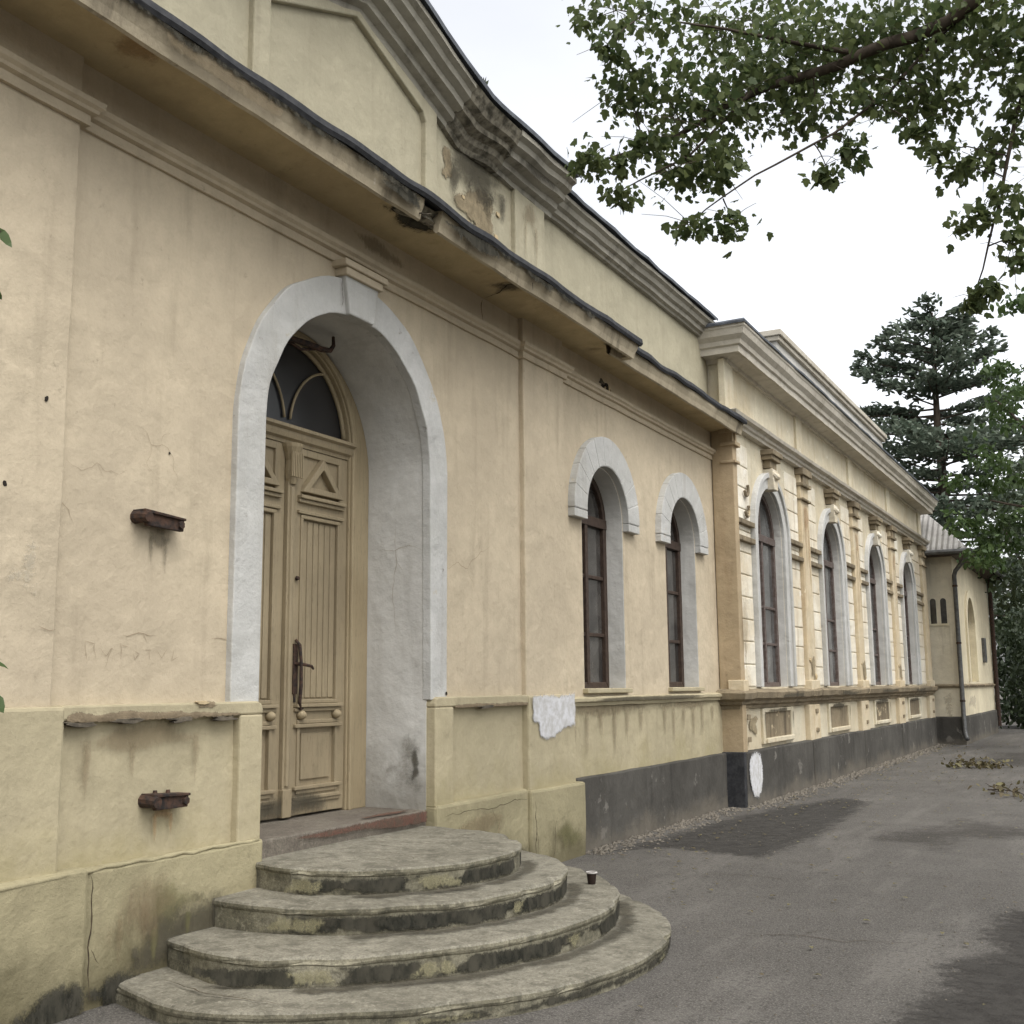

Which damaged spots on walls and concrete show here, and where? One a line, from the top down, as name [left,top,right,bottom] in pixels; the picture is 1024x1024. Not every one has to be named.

damp [452,151,505,218]
damp [384,206,435,233]
spalling [455,190,500,239]
damp [500,252,609,327]
peeling [63,718,145,727]
peeling [163,701,238,723]
damp [402,743,418,783]
crack [446,799,557,854]
crack [87,877,99,1000]
damp [12,949,138,1024]